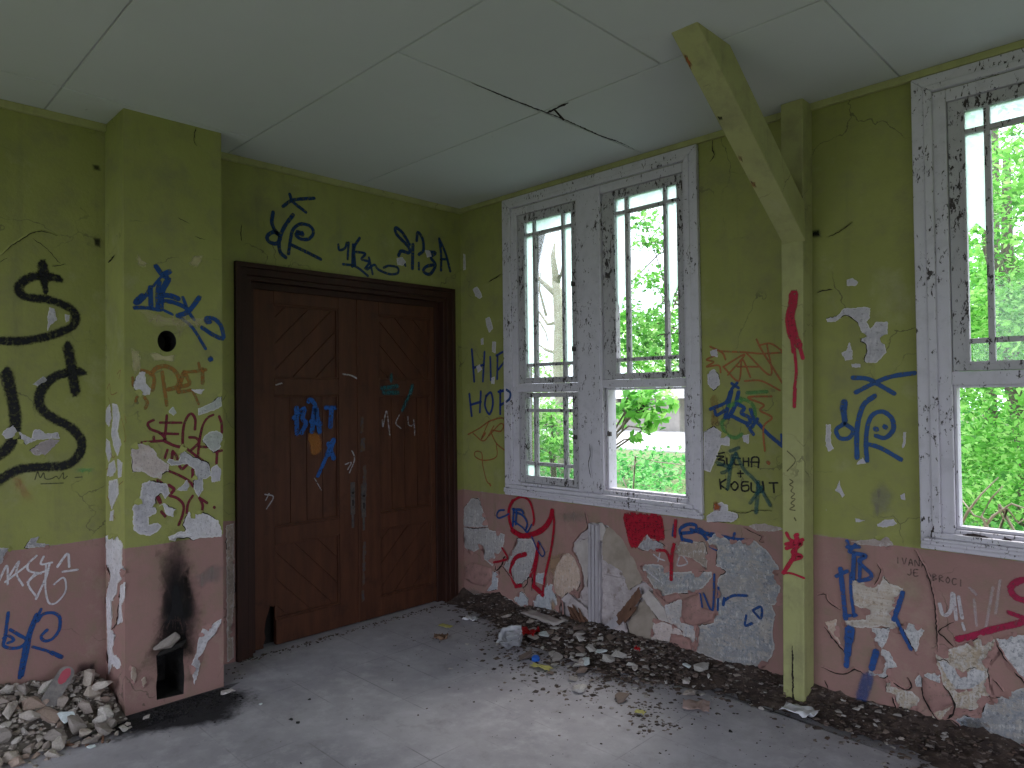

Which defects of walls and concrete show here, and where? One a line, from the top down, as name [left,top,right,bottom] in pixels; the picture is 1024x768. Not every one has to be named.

crack [472,83,634,150]
peeling [2,425,60,458]
peeling [133,371,151,397]
peeling [192,389,222,415]
peeling [826,307,890,368]
peeling [105,403,235,689]
spalling [463,498,581,612]
spalling [637,502,783,669]
crack [915,549,954,652]
crack [817,592,961,726]
spalling [824,576,1024,747]
crack [993,640,1024,692]